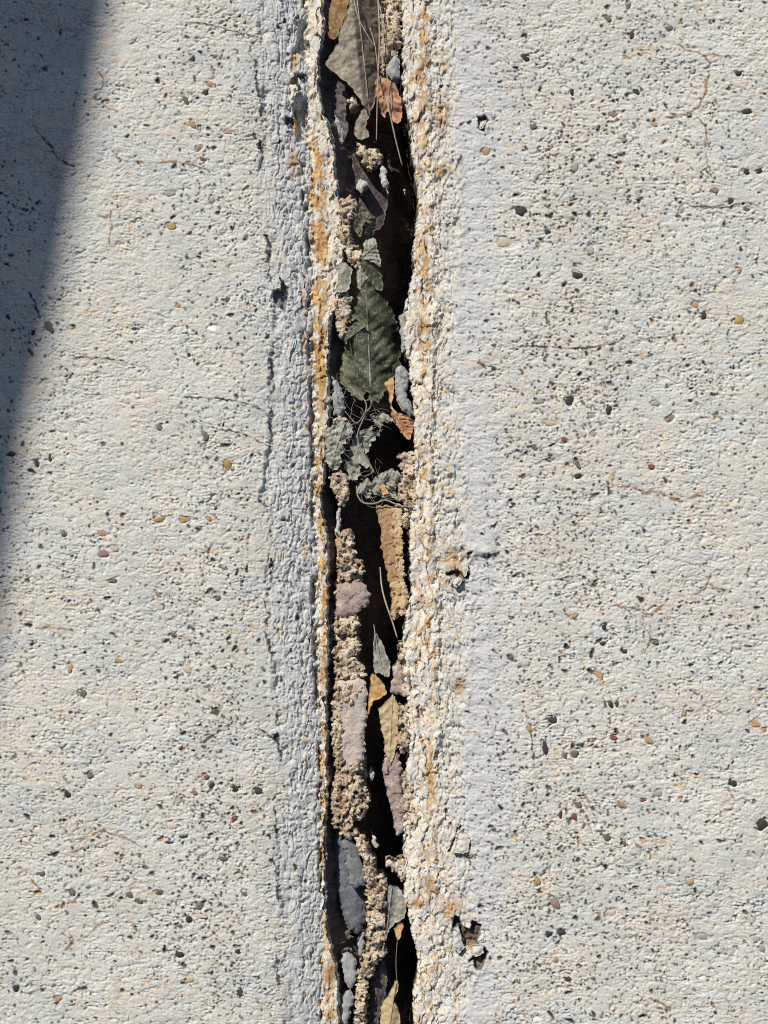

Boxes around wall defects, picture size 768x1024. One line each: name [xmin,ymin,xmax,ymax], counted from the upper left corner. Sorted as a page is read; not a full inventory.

crack [316,0,462,1024]
spalling [401,0,486,1024]